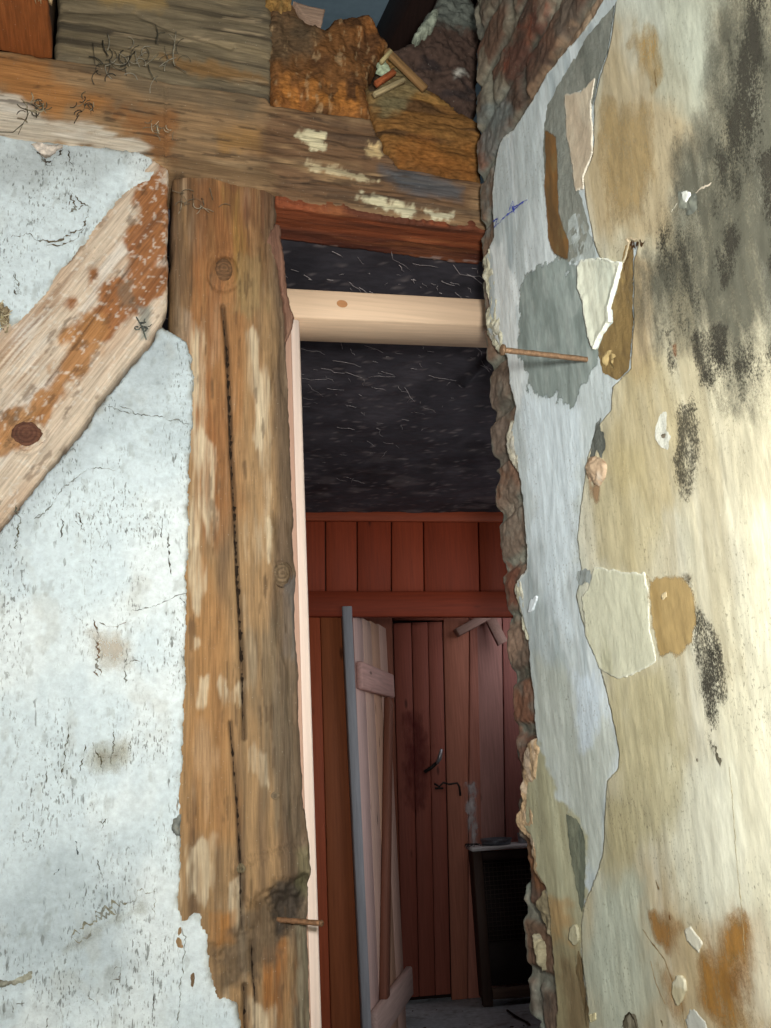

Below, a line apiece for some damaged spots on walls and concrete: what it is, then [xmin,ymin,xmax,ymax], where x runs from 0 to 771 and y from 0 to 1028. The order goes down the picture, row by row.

peeling [543,6,634,380]
water stain [637,0,771,401]
flaking render [482,249,506,355]
water stain [673,403,700,500]
crack [222,314,244,907]
water stain [649,576,728,748]
flaking render [516,738,552,971]
peeling [566,814,585,911]
crack [243,944,256,1014]